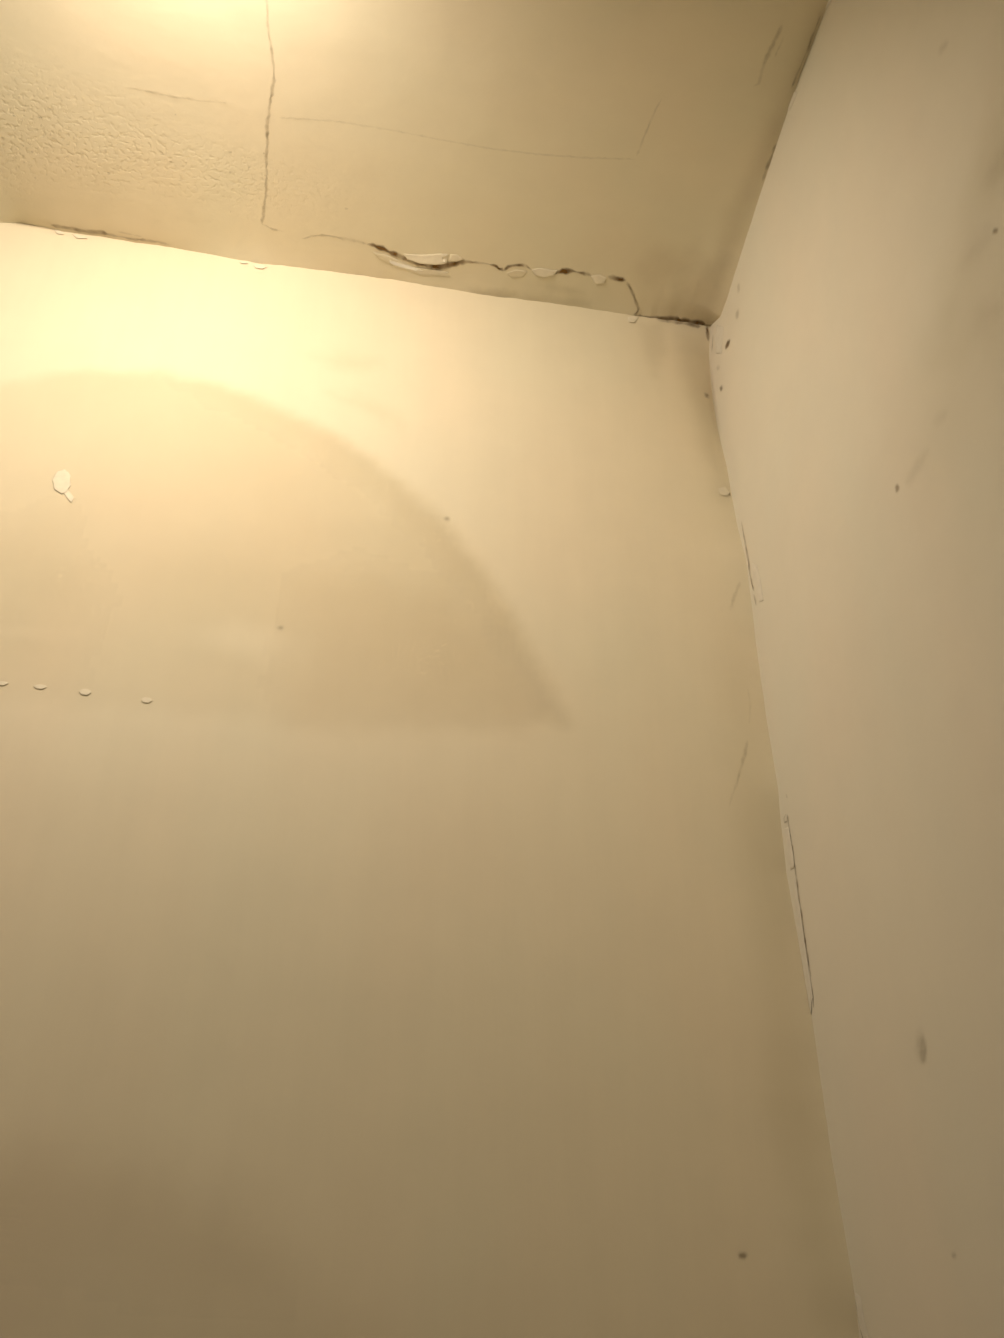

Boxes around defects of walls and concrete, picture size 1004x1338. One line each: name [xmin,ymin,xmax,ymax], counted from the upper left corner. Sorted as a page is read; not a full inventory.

crack [371,244,624,284]
crack [628,312,723,354]